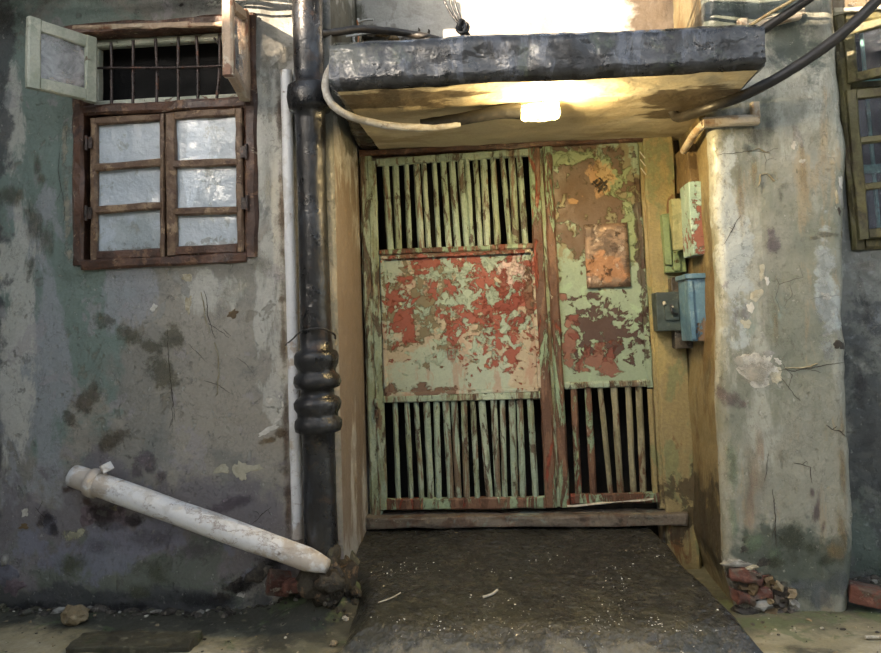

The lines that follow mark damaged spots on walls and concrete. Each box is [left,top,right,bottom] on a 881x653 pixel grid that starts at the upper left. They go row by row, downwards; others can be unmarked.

crack [201,292,229,338]
peeling [735,350,782,388]
crack [779,362,843,400]